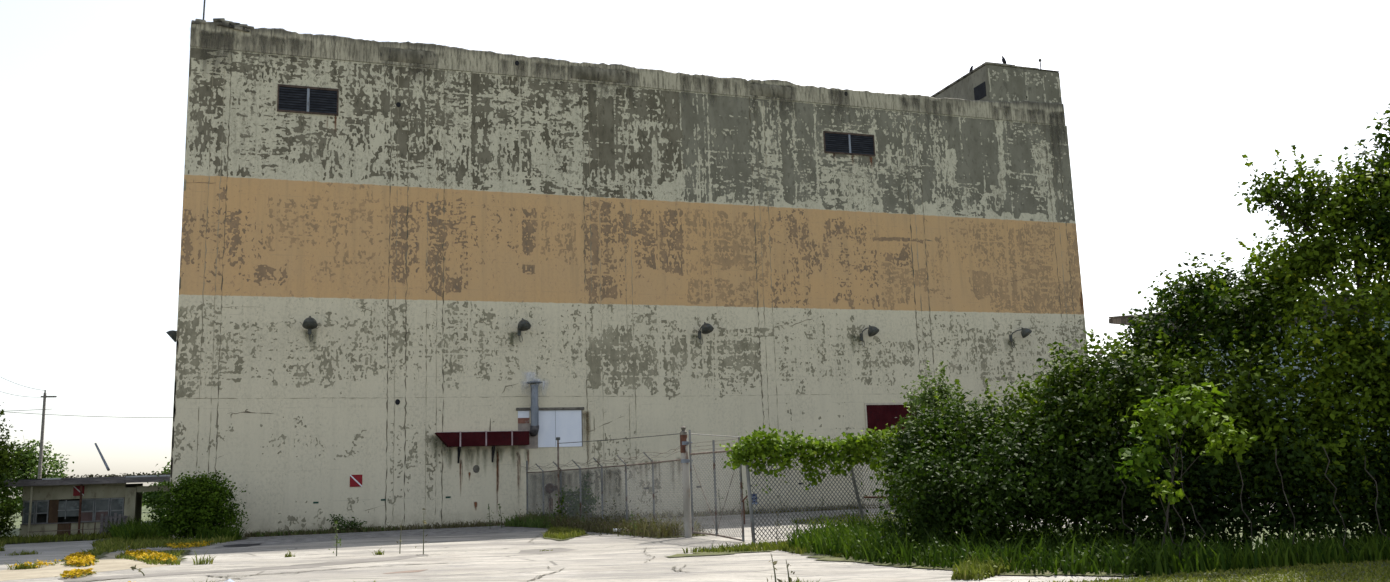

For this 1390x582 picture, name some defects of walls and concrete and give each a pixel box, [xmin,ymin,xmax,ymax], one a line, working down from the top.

peeling [170,48,1087,504]